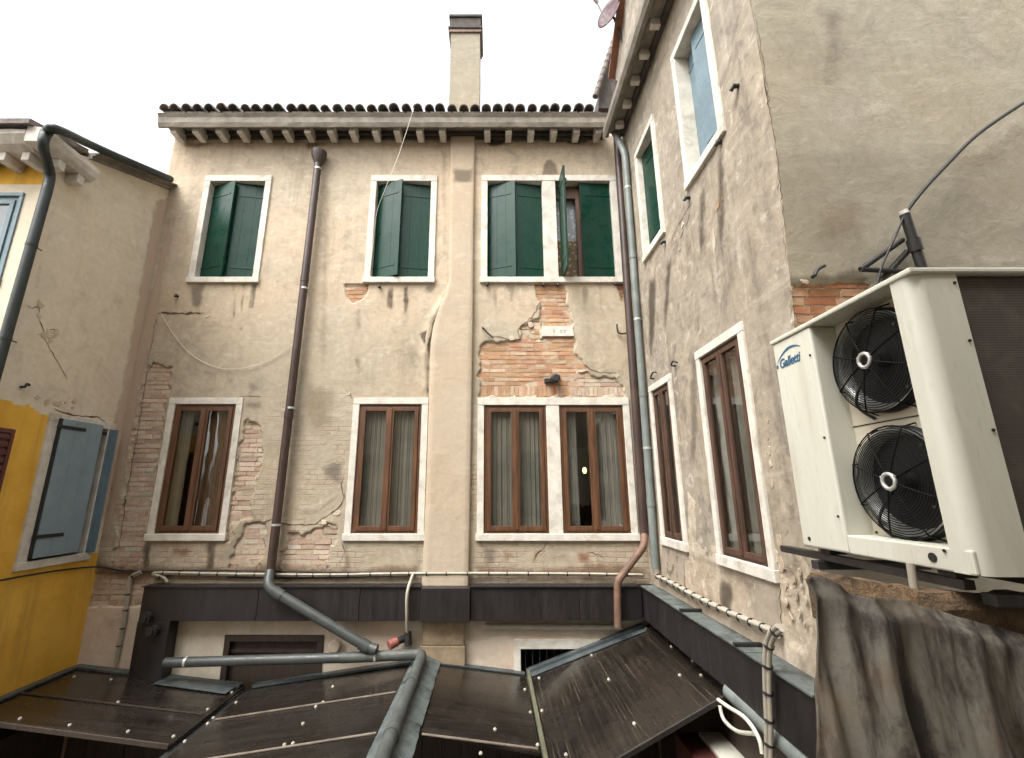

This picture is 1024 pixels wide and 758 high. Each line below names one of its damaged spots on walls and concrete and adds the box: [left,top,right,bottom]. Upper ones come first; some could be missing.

crack [28,299,105,422]
flaking render [345,285,369,303]
flaking render [477,284,625,398]
flaking render [789,279,869,328]
flaking render [90,363,173,606]
crack [106,311,211,555]
flaking render [226,420,266,570]
crack [256,476,346,572]